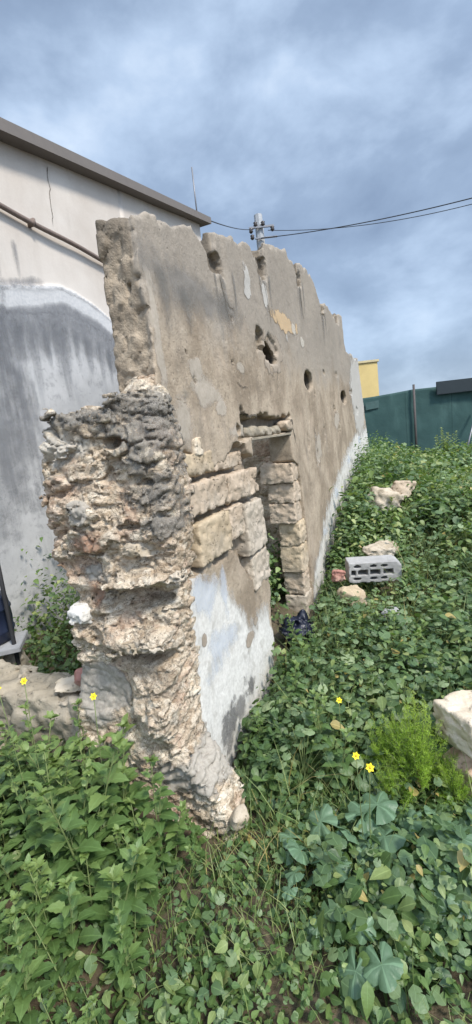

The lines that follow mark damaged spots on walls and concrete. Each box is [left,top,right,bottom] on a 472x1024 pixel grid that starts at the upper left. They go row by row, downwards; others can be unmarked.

damp [0,305,115,362]
spalling [242,262,304,375]
damp [39,385,176,469]
spalling [174,396,193,449]
damp [222,677,254,754]